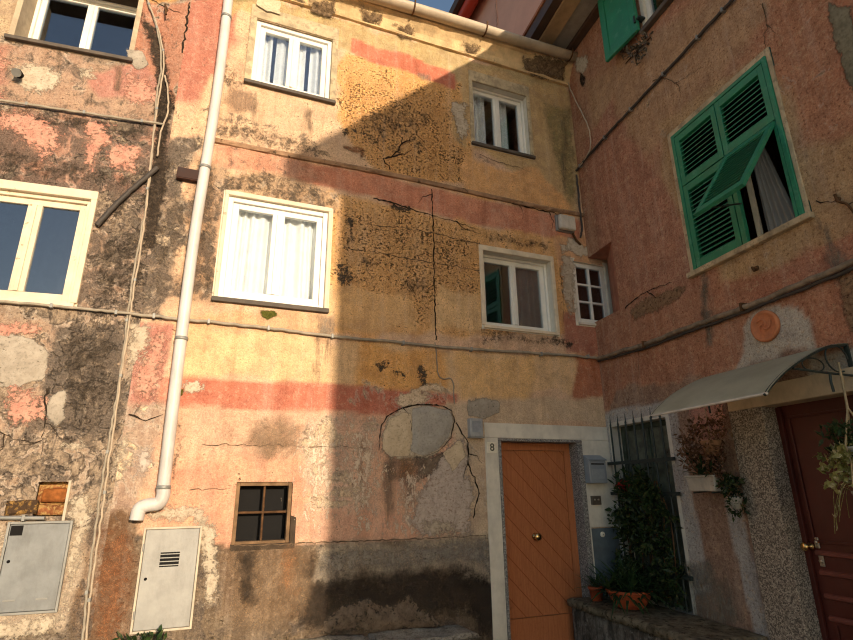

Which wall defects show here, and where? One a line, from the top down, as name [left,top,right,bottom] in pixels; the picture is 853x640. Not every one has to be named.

crack [153,0,190,53]
damp [1,109,136,137]
mould [0,152,130,187]
crack [383,133,415,170]
crack [489,198,561,230]
crack [342,189,481,340]
crack [0,388,62,454]
spalling [4,480,72,521]
crack [203,404,486,546]
damp [232,551,493,636]